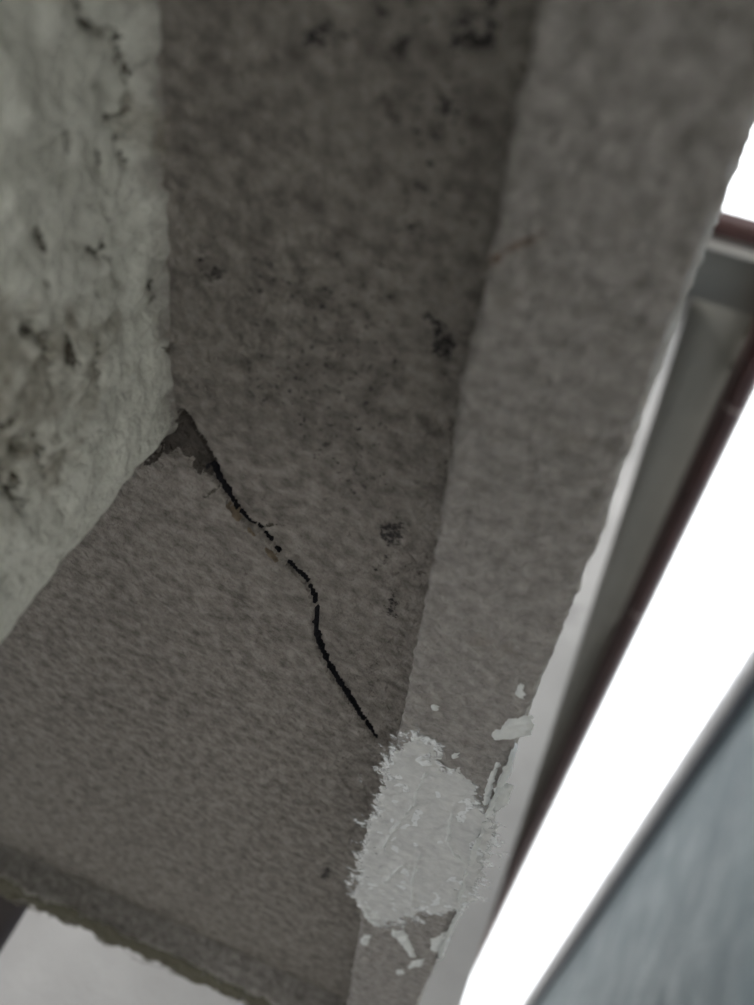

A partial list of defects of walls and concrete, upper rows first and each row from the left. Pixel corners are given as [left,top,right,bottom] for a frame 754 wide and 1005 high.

crack [203,460,378,738]
peeling [515,683,526,700]
peeling [345,715,534,975]